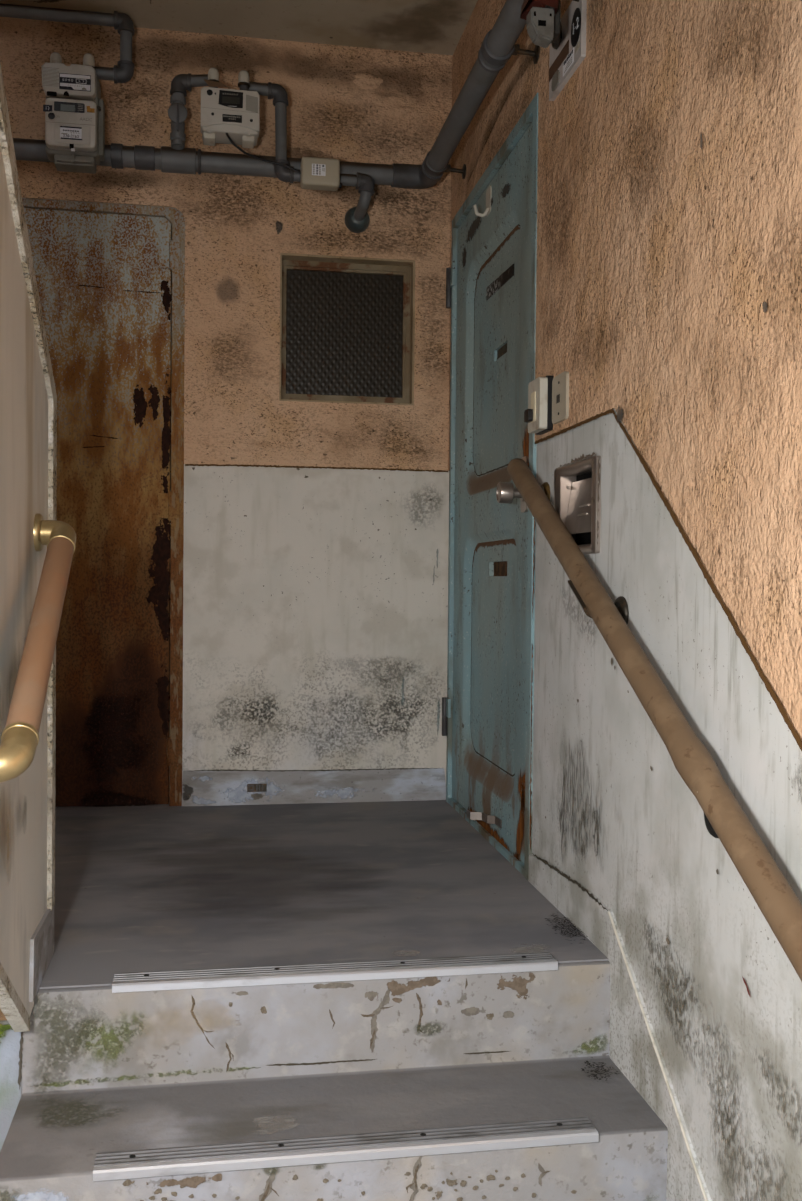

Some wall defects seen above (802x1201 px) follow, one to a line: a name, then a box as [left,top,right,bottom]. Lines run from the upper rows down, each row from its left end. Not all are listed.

corrosion [161,280,172,320]
corrosion [132,365,171,493]
corrosion [146,518,171,641]
corrosion [156,665,170,739]
corrosion [468,645,533,860]
corrosion [82,792,155,807]
crack [191,996,234,1072]
peeling [313,976,450,1005]
peeling [461,972,535,1020]
water stain [645,930,783,1201]
water stain [762,1064,802,1143]
peeling [123,1173,222,1201]